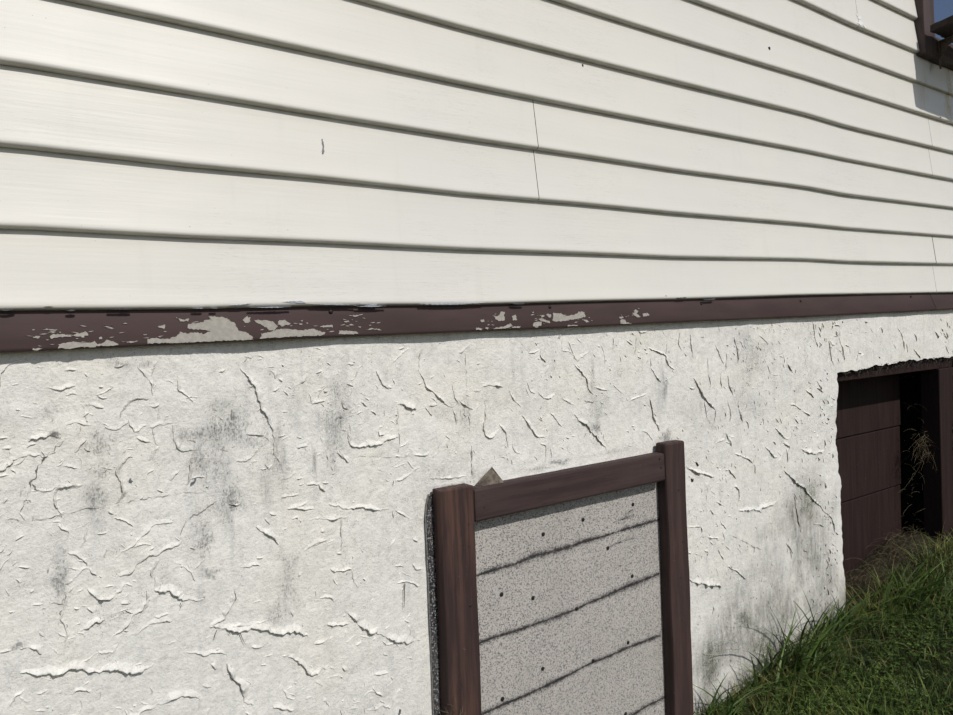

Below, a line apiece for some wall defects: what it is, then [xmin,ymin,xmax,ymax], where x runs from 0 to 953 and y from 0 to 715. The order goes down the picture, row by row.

peeling [32,301,380,351]
peeling [476,303,593,330]